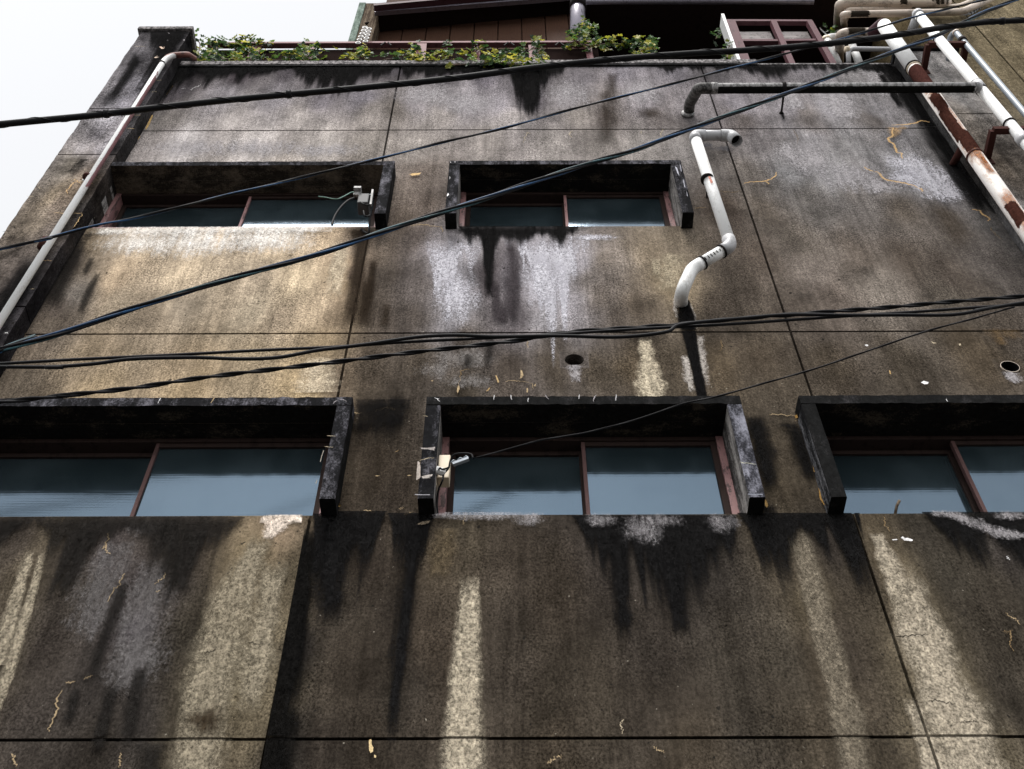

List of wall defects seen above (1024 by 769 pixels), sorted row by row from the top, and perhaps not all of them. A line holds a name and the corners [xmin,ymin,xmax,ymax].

water stain [162,66,588,113]
water stain [659,65,994,213]
crack [864,120,928,192]
water stain [430,226,611,357]
water stain [627,332,665,396]
water stain [674,300,708,396]
water stain [746,417,815,486]
water stain [922,512,1024,563]
water stain [0,517,245,708]
water stain [177,511,450,769]
water stain [572,504,1001,769]
water stain [94,668,162,769]